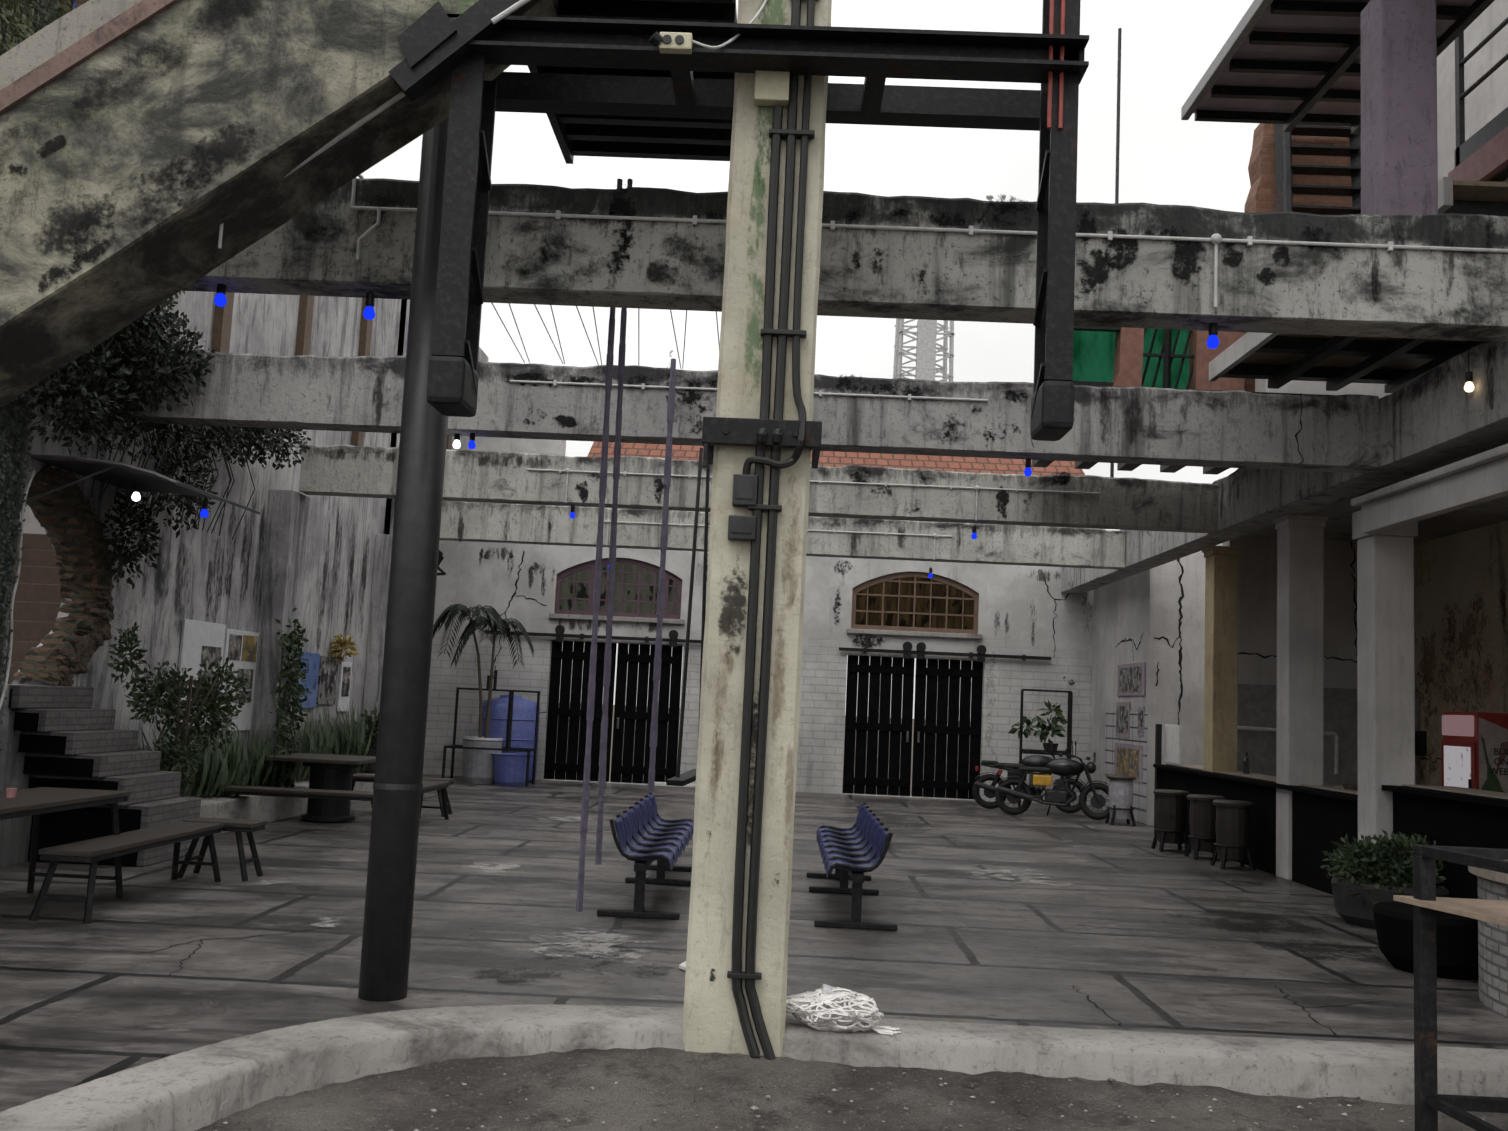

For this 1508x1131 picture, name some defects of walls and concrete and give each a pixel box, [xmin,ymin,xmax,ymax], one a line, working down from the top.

water stain [0,125,65,175]
water stain [35,124,254,292]
water stain [581,184,636,287]
water stain [647,236,701,284]
water stain [1076,209,1206,294]
water stain [1256,246,1290,286]
water stain [317,511,370,648]
crack [476,551,547,678]
crack [1116,559,1184,725]
crack [1238,651,1277,659]
crack [1324,541,1357,663]
peeling [1416,591,1492,782]